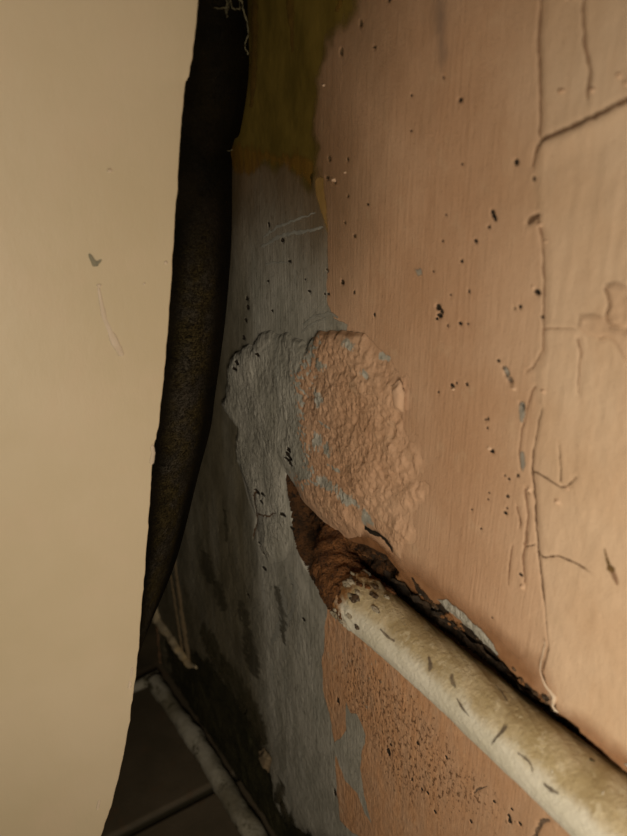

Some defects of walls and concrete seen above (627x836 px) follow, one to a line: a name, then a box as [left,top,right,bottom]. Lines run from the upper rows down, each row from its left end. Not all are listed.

damp [232,0,356,227]
crack [532,0,627,166]
peeling [157,162,371,836]
spalling [346,538,399,586]
crack [508,213,590,602]